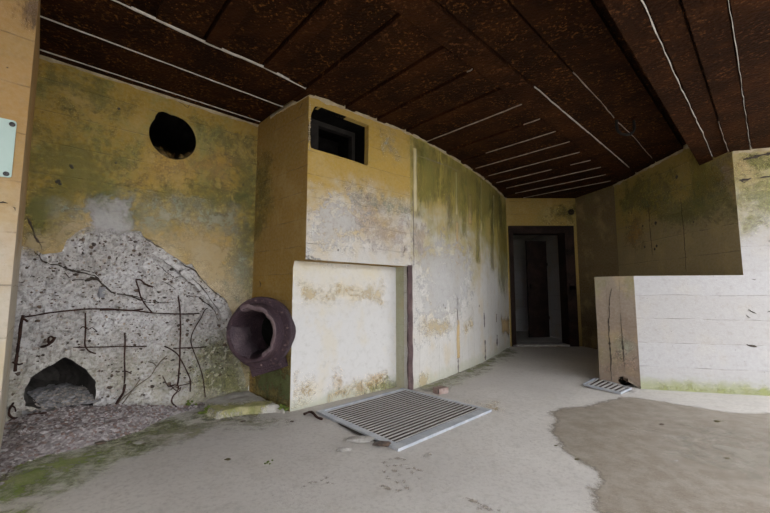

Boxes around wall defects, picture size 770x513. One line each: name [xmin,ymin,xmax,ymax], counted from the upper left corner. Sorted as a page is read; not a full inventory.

leakage [40,49,260,122]
leakage [84,192,135,235]
leakage [413,148,422,212]
leakage [416,183,494,358]
spalling [5,227,249,422]
crack [608,289,625,381]